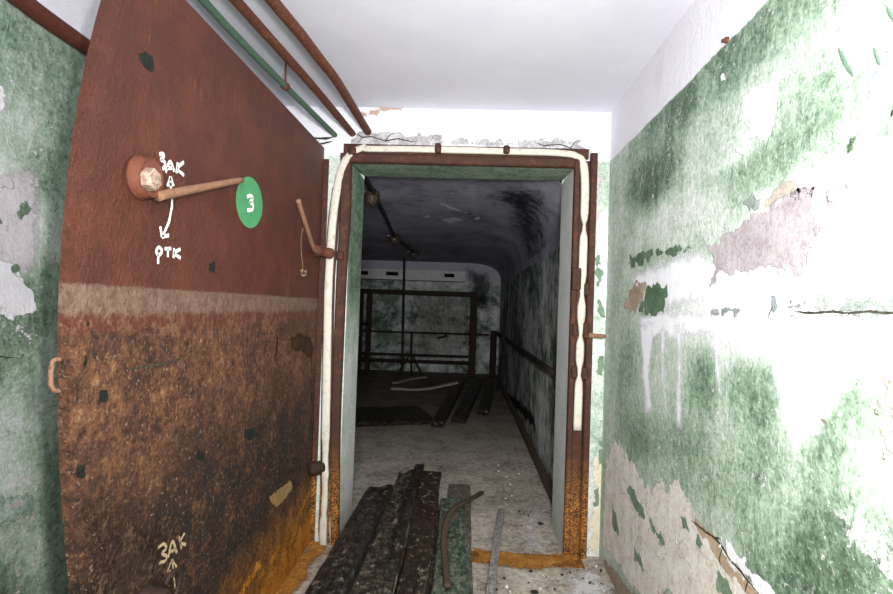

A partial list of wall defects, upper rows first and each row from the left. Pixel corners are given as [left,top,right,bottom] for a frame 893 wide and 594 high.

peeling [0,80,20,112]
flaking render [707,136,893,287]
flaking render [0,168,42,345]
peeling [595,255,604,287]
peeling [629,245,691,268]
flaking render [771,292,893,320]
crack [794,309,893,317]
peeling [596,355,604,375]
peeling [867,362,893,460]
peeling [587,440,775,594]
corrosion [474,548,578,570]